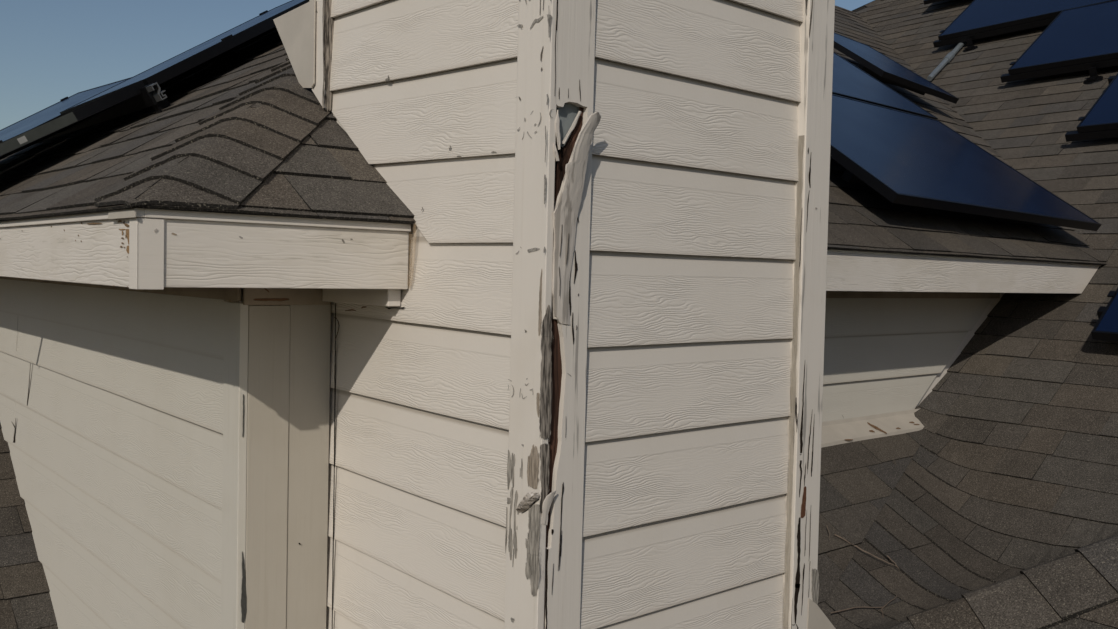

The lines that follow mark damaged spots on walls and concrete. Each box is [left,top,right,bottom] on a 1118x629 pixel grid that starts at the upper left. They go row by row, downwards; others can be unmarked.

spalling [517,14,552,38]
spalling [507,307,562,596]